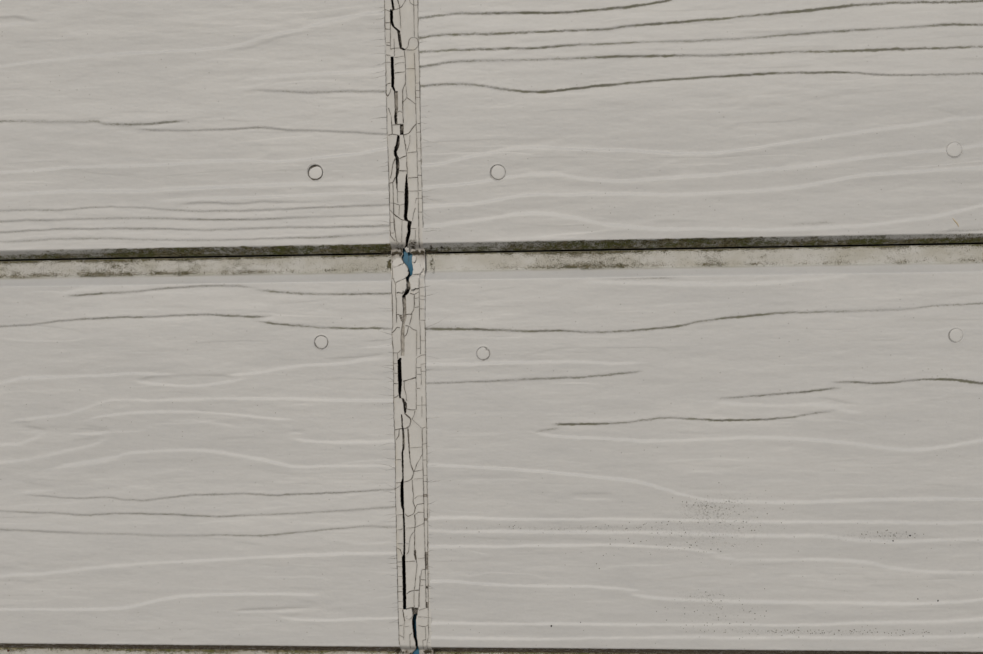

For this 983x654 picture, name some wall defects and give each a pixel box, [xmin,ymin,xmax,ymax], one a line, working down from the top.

crack [378,0,435,644]
peeling [392,247,423,293]